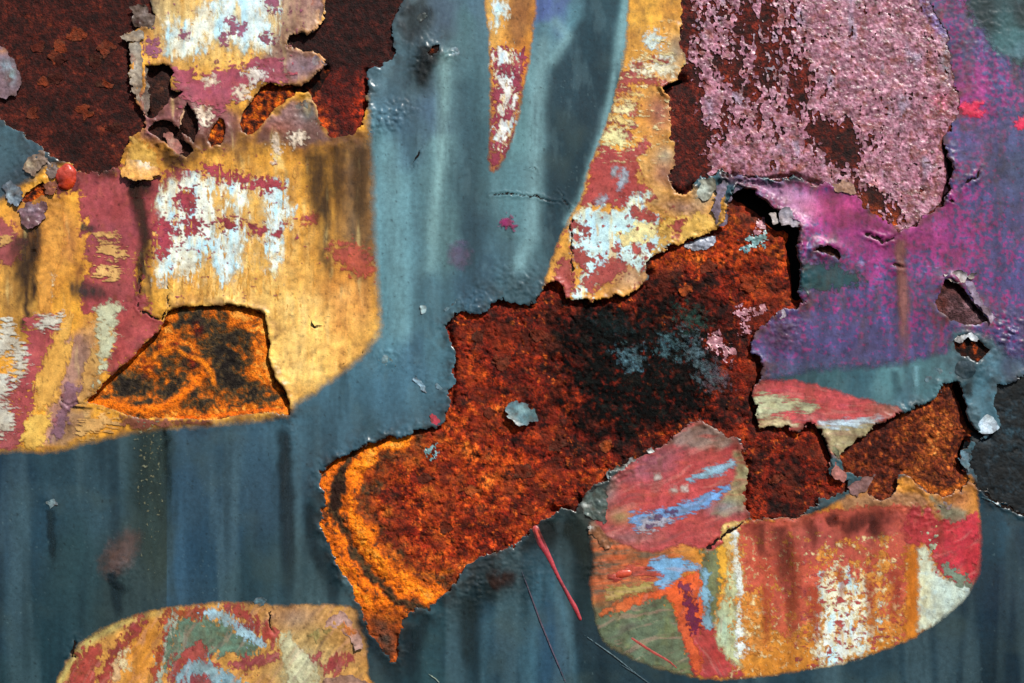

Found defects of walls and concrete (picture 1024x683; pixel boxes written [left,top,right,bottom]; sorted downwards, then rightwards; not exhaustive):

rust [0,0,226,175]
peeling [0,0,379,451]
crack [494,192,575,290]
rust [663,0,960,335]
damp [140,427,172,552]
rust [88,304,290,420]
damp [279,432,294,556]
peeling [413,377,448,395]
peeling [505,401,539,426]
rust [319,199,975,662]
peeling [543,0,1024,679]
damp [357,618,390,667]